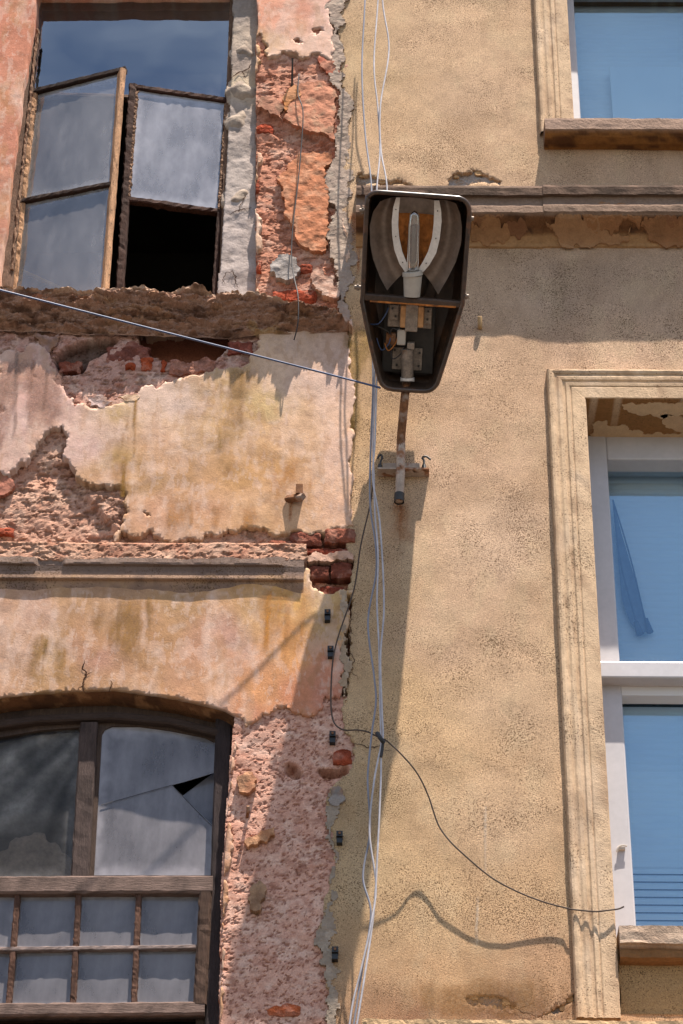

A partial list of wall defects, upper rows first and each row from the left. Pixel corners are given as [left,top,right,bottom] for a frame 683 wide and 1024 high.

flaking render [255,34,348,310]
peeling [448,171,501,186]
peeling [471,214,528,247]
peeling [546,201,683,249]
flaking render [0,331,259,409]
peeling [590,402,683,437]
flaking render [0,429,356,594]
flaking render [218,697,355,1024]